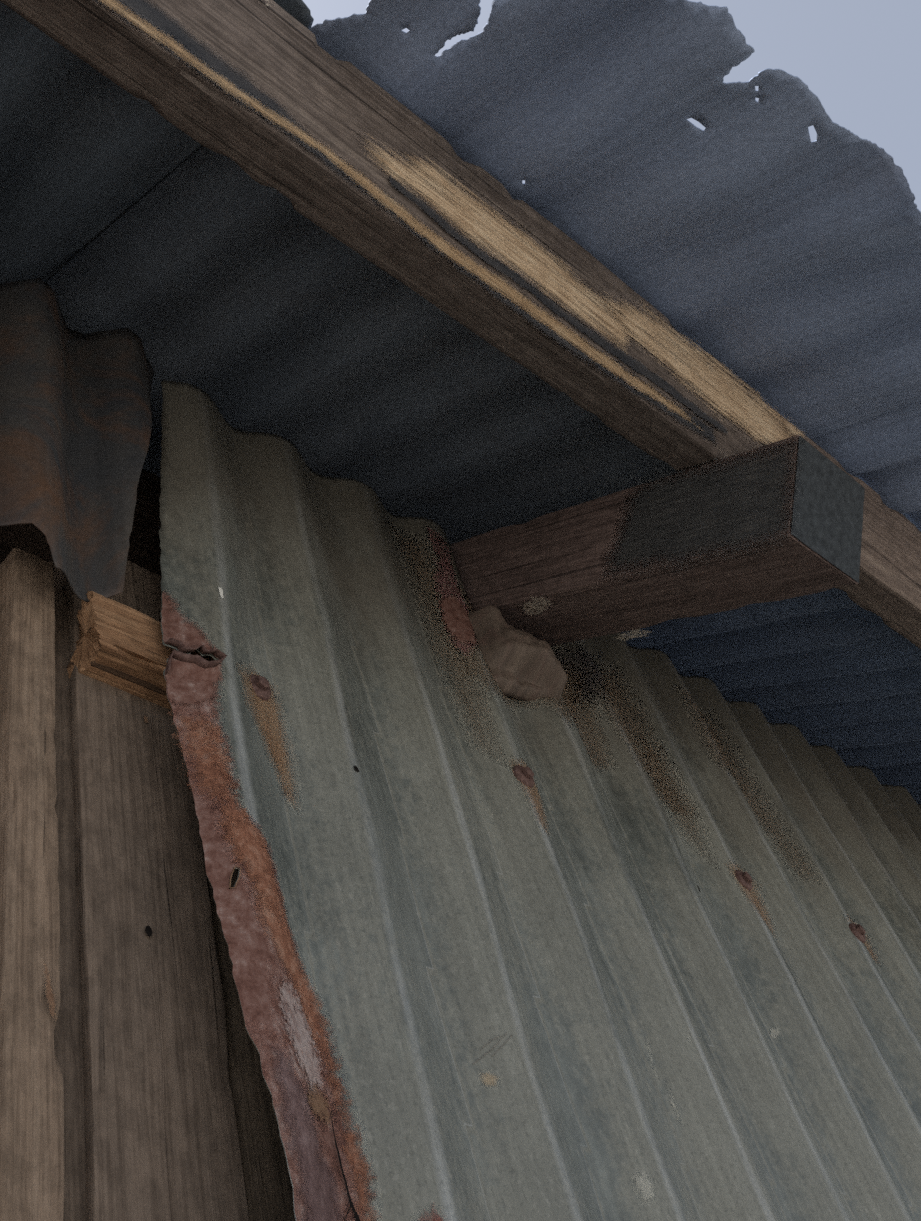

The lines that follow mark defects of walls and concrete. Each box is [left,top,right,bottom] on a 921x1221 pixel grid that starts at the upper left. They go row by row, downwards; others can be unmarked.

corrosion [164,658,374,1221]
crack [330,1113,360,1221]